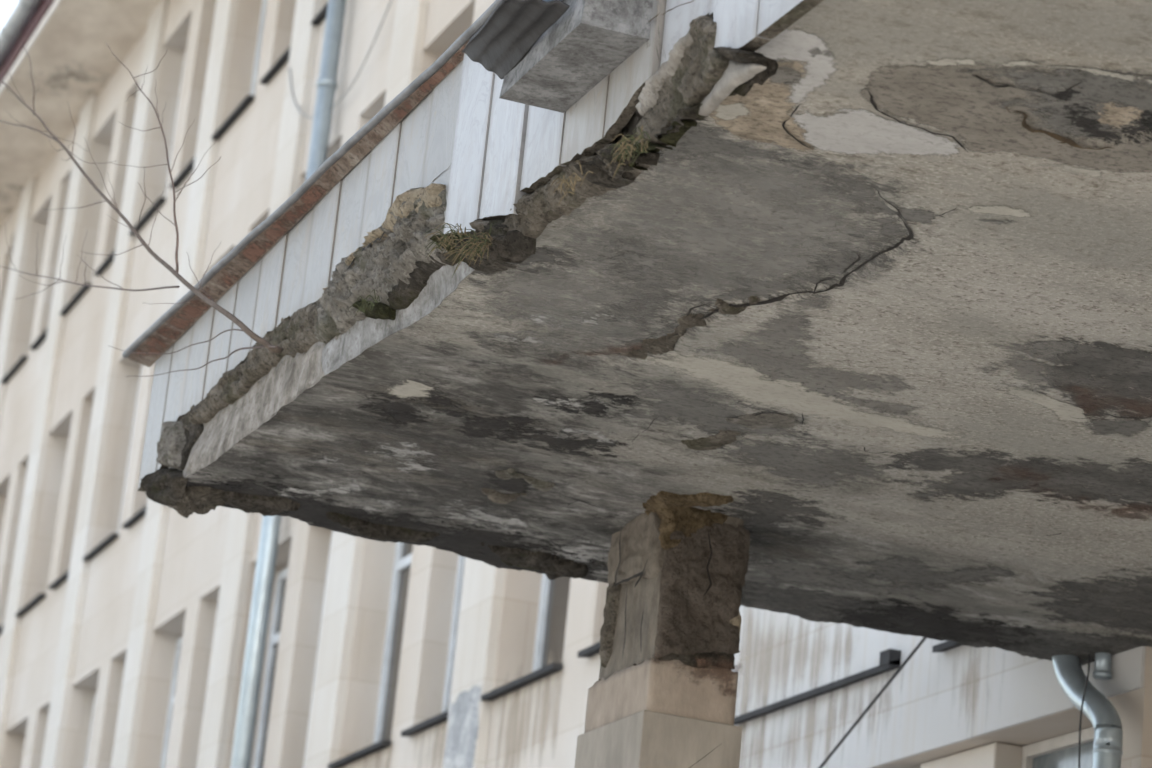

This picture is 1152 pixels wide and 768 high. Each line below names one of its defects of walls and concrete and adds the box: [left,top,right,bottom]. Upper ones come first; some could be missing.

flaking render [926,58,982,66]
flaking render [995,61,1152,84]
spalling [140,15,968,518]
crack [660,186,957,355]
water stain [186,120,1152,583]
spalling [326,512,440,543]
spalling [481,543,588,580]
spalling [599,512,750,670]
water stain [741,555,1152,666]